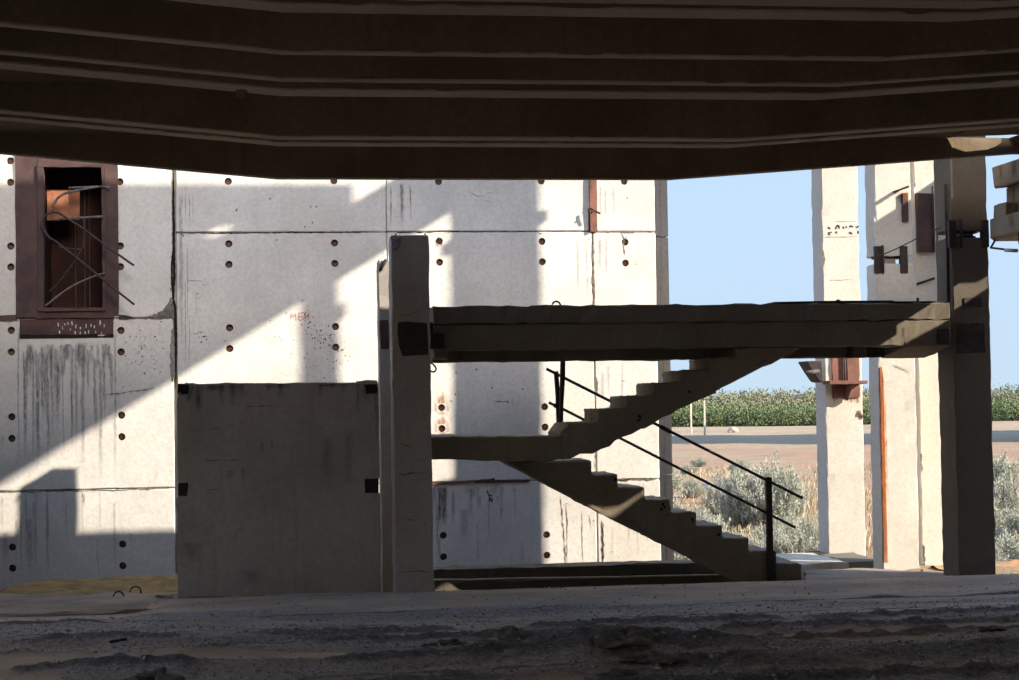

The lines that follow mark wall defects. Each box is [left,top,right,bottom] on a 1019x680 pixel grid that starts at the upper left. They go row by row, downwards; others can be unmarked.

leakage [34,320,105,398]